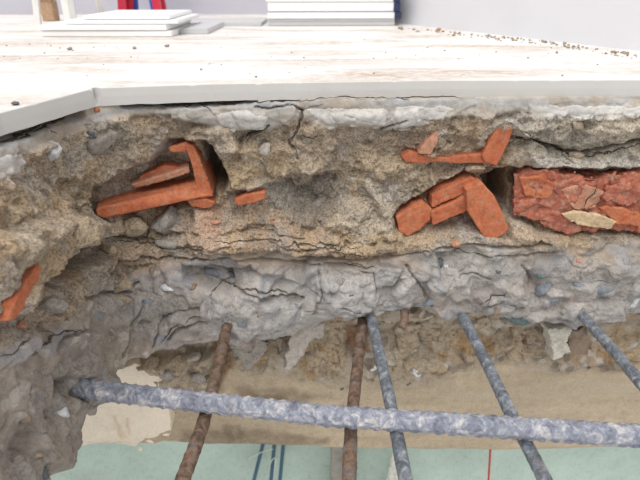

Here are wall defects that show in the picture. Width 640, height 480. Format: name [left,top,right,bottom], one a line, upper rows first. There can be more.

crack [136,96,462,159]
crack [112,216,364,267]
crack [216,280,300,296]
spalling [14,247,640,480]